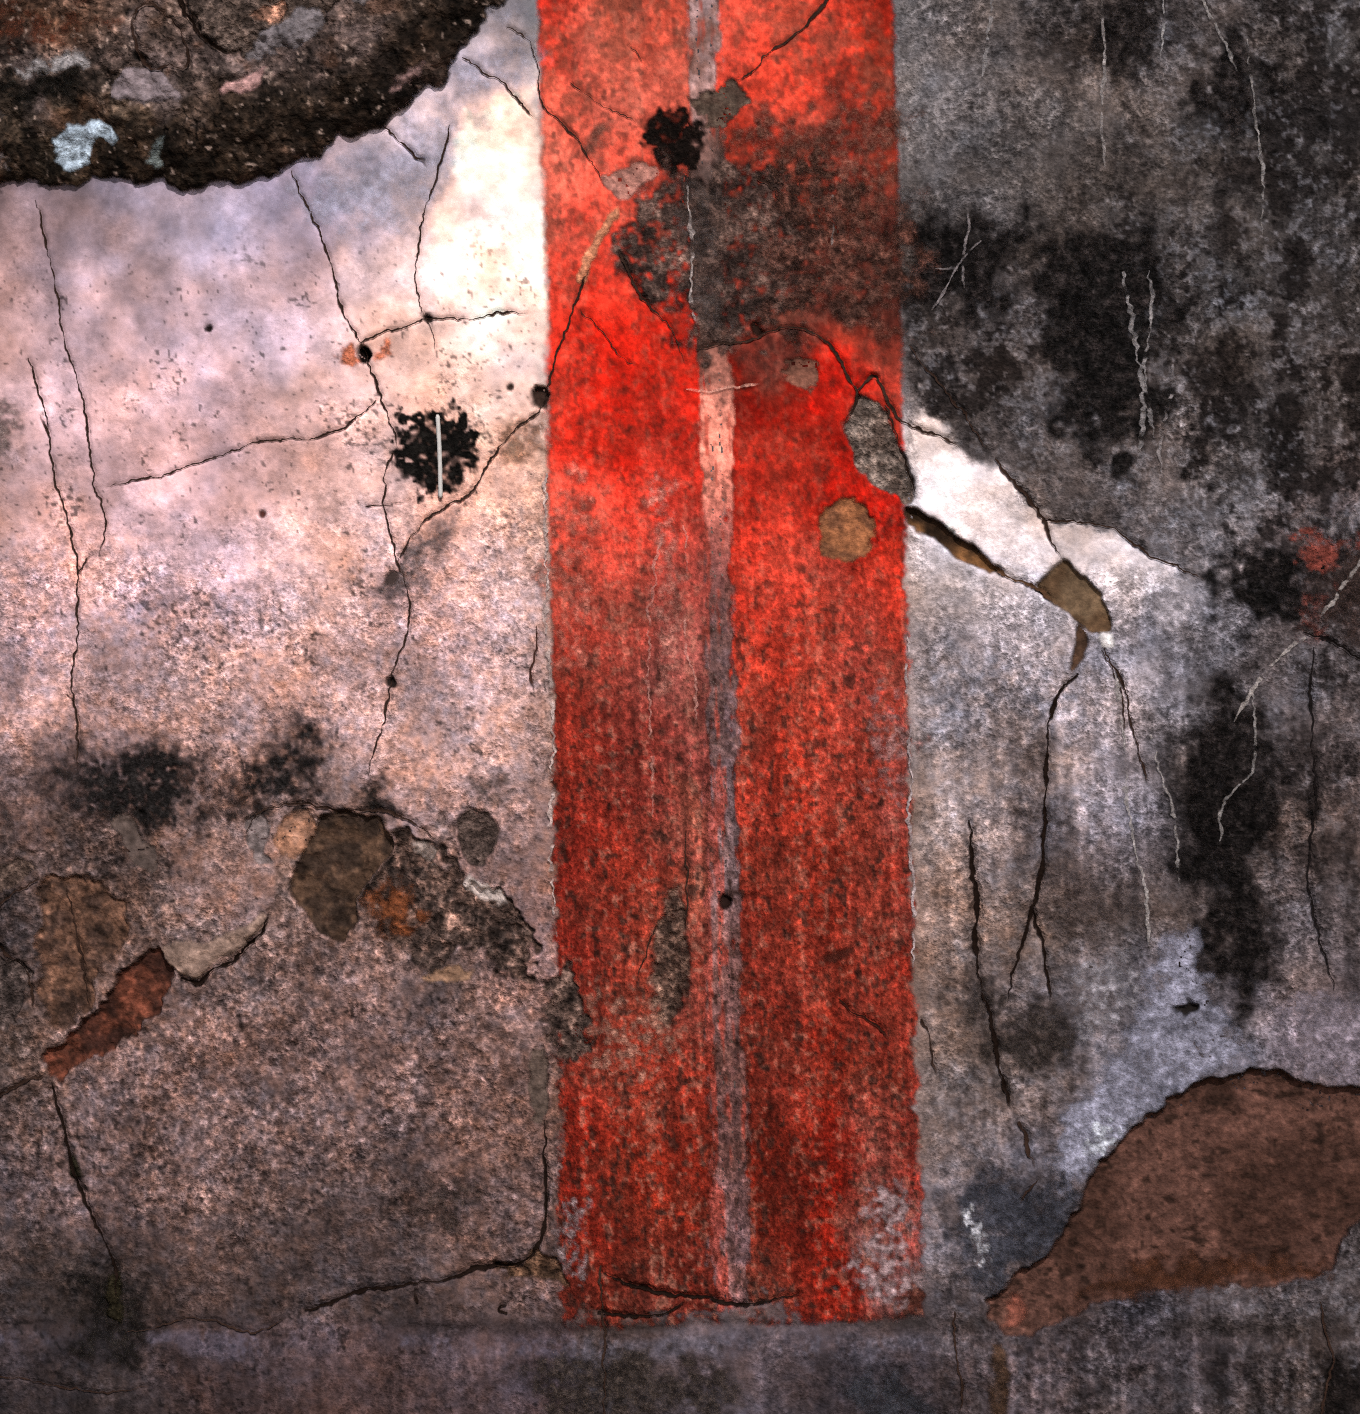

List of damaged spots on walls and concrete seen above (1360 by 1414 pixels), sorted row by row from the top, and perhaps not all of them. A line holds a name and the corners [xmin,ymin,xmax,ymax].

crack [462,27,634,182]
crack [28,125,633,771]
mould [391,398,490,504]
leakage [611,95,1188,479]
crack [619,251,1200,578]
spalling [1037,560,1114,671]
spalling [0,857,266,1082]
mould [47,714,325,836]
spalling [245,808,691,1123]
crack [968,648,1147,1199]
leakage [944,674,1317,1297]
spalling [986,1068,1360,1336]